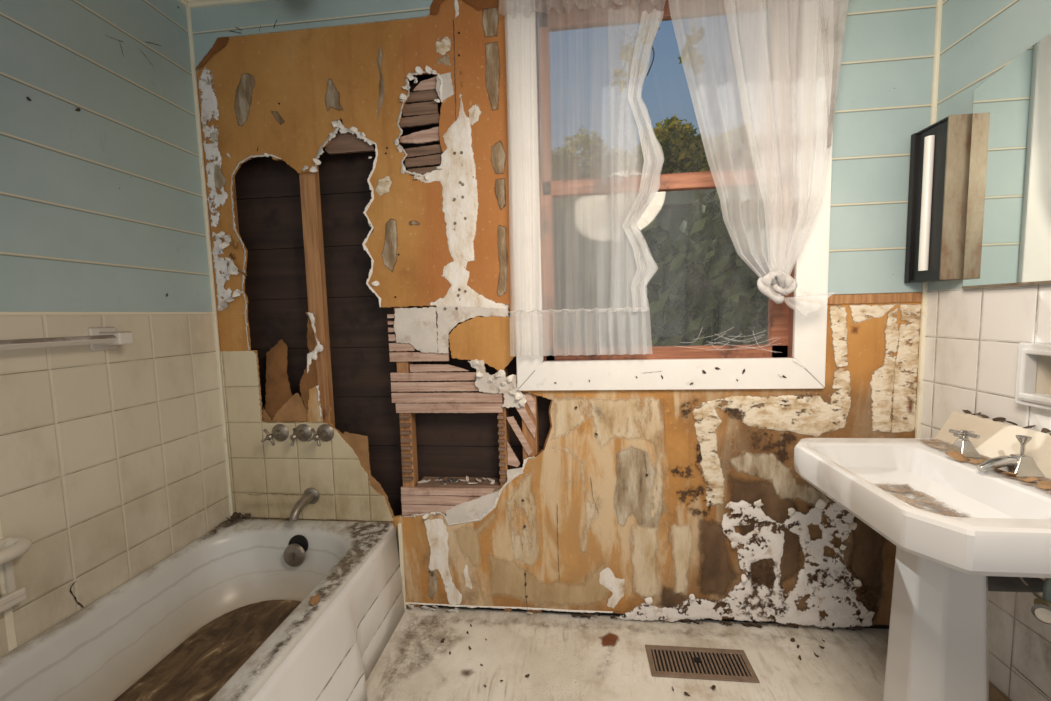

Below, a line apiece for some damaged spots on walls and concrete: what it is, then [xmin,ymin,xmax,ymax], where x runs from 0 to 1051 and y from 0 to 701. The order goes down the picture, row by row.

peeling [198,68,281,351]
spalling [302,65,454,308]
spalling [394,296,527,408]
spalling [404,400,552,526]
peeling [620,499,875,628]